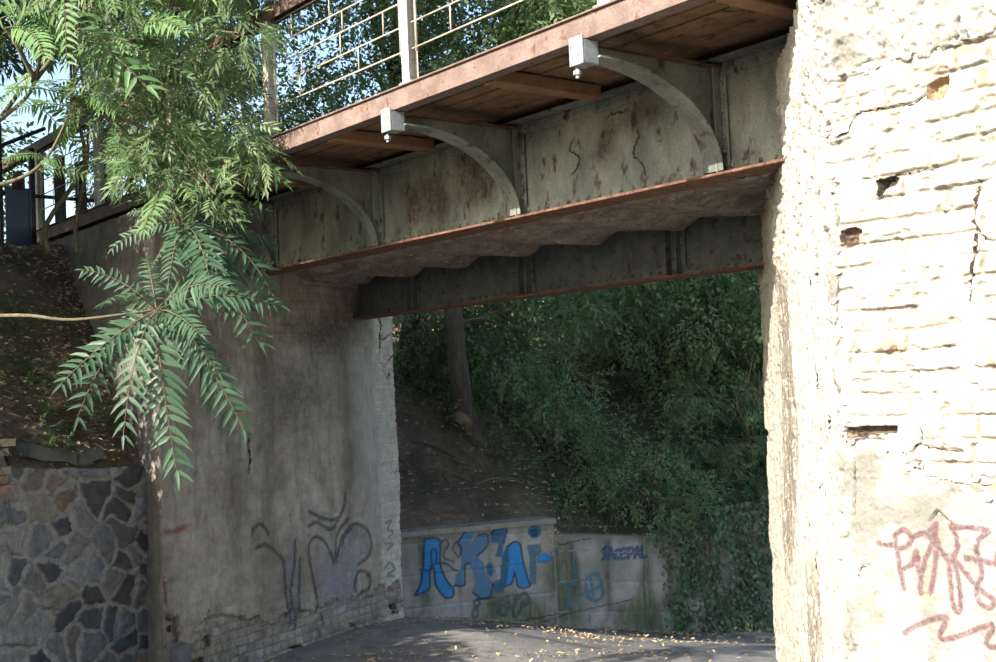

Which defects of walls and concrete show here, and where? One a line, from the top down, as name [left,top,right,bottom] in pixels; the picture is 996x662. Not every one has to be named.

flaking render [822,24,996,503]
crack [969,180,993,302]
flaking render [191,577,404,662]